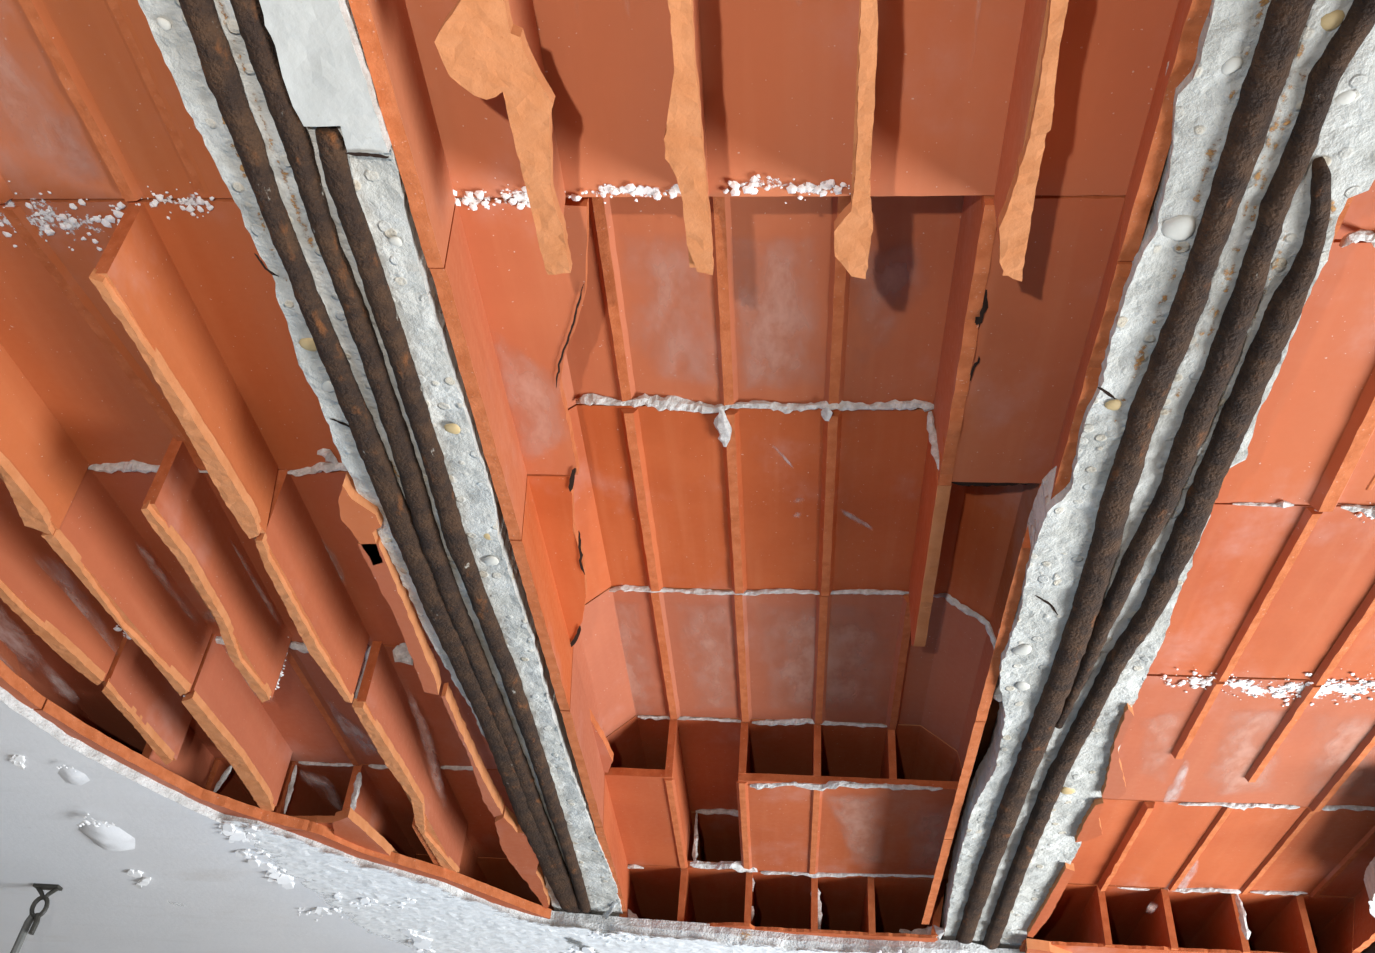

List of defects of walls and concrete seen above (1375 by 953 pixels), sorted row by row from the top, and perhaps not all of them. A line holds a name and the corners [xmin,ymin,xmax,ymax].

corrosion [1254,74,1306,189]
damp [0,181,214,251]
corrosion [255,100,313,247]
damp [453,178,531,211]
damp [568,183,681,204]
damp [722,174,851,204]
spalling [138,0,485,737]
spalling [941,0,1375,945]
spalling [0,127,1211,953]
damp [1161,665,1375,707]
damp [1225,716,1266,791]
damp [1328,727,1375,785]